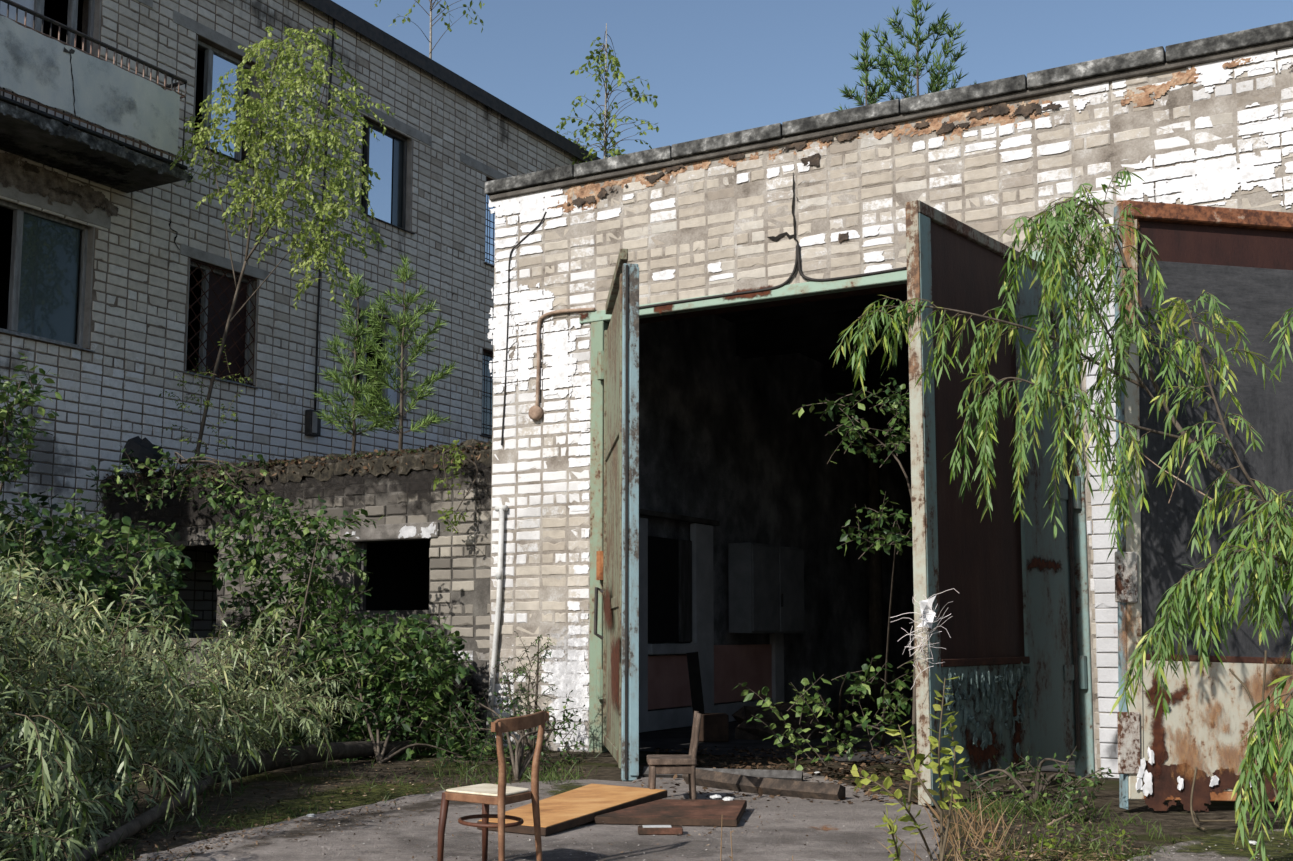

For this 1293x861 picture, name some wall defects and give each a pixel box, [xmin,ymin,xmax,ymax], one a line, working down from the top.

spalling [0,152,119,217]
peeling [488,46,1293,511]
peeling [573,529,589,574]
corrosion [1027,556,1062,573]
corrosion [602,582,620,714]
corrosion [965,683,1024,775]
corrosion [1144,652,1293,779]